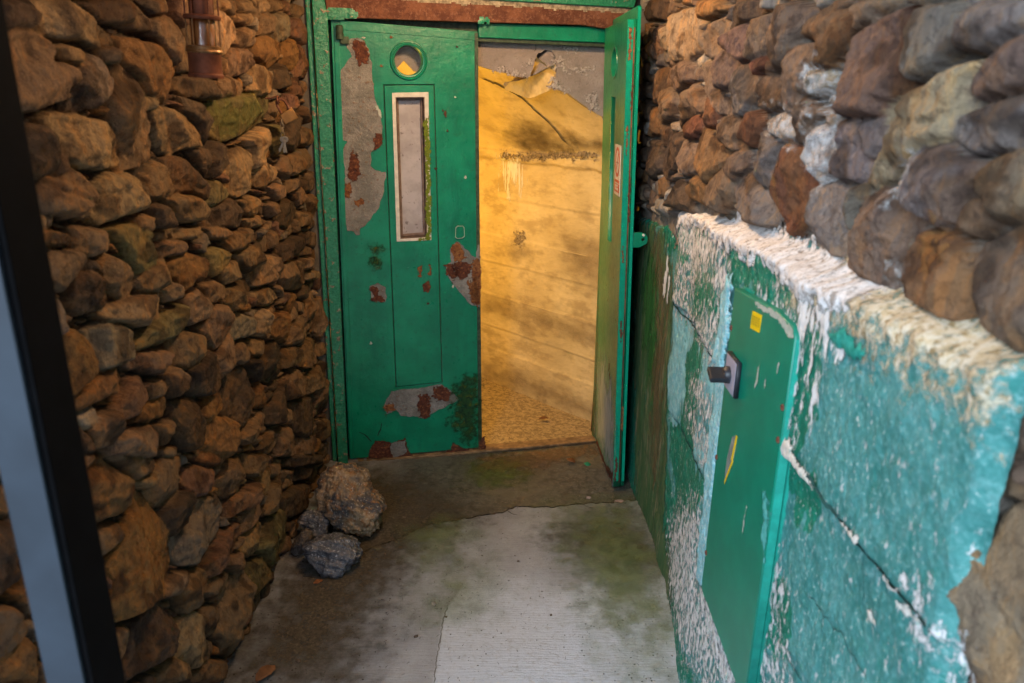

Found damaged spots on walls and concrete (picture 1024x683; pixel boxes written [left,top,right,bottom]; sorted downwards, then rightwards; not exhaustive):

spalling [492,45,596,98]
peeling [341,37,386,235]
crack [483,79,566,143]
water stain [496,147,523,202]
peeling [443,241,482,307]
water stain [663,223,731,367]
water stain [757,280,1024,436]
peeling [383,384,458,419]
water stain [547,501,659,572]
crack [780,437,930,633]